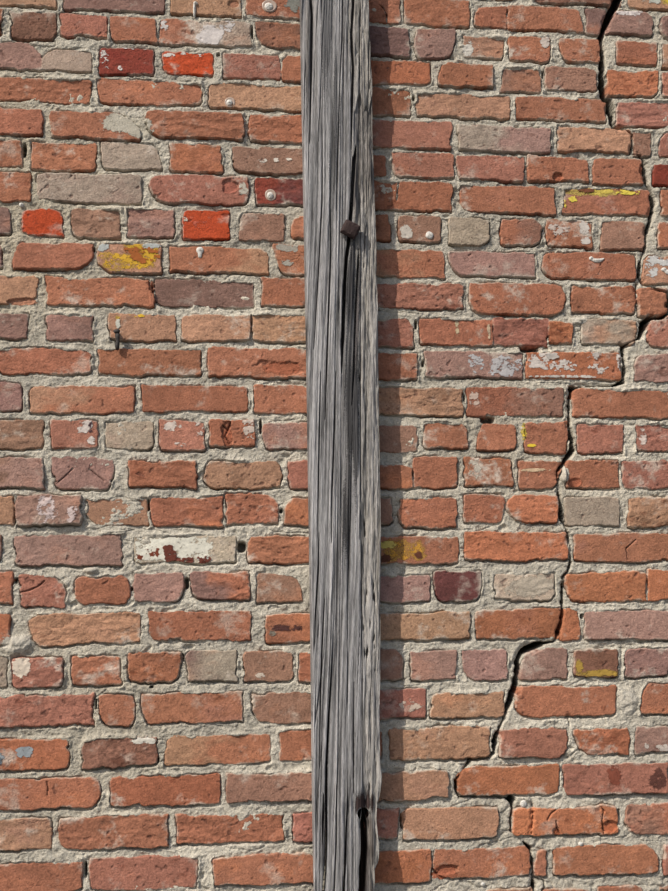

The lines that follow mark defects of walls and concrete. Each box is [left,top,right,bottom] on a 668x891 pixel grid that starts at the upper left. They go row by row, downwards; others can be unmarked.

crack [597,0,655,238]
crack [602,260,668,387]
crack [556,387,575,481]
crack [467,505,571,763]
crack [503,795,534,891]